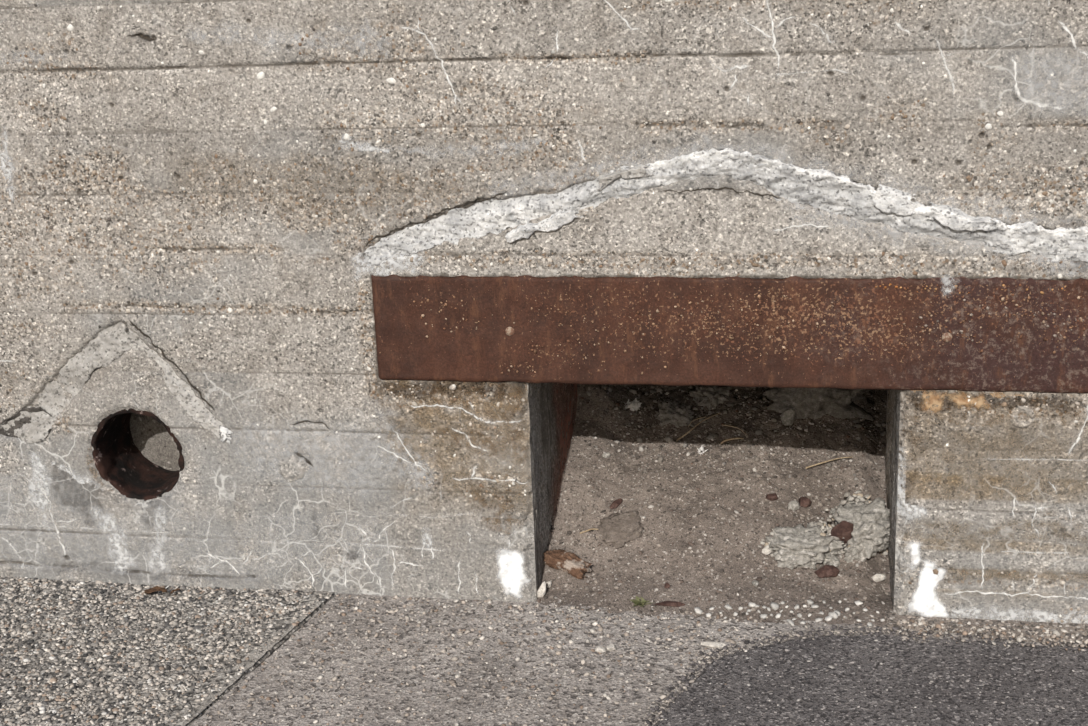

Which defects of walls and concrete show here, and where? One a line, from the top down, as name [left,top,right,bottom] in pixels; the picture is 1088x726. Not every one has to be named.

spalling [0,3,1088,452]
corrosion [386,283,1086,507]
crack [0,476,91,567]
crack [207,552,265,573]
crack [289,539,325,587]
crack [379,431,426,471]
crack [344,498,478,593]
crack [412,404,526,484]
spalling [459,460,527,506]
crack [948,406,1088,600]